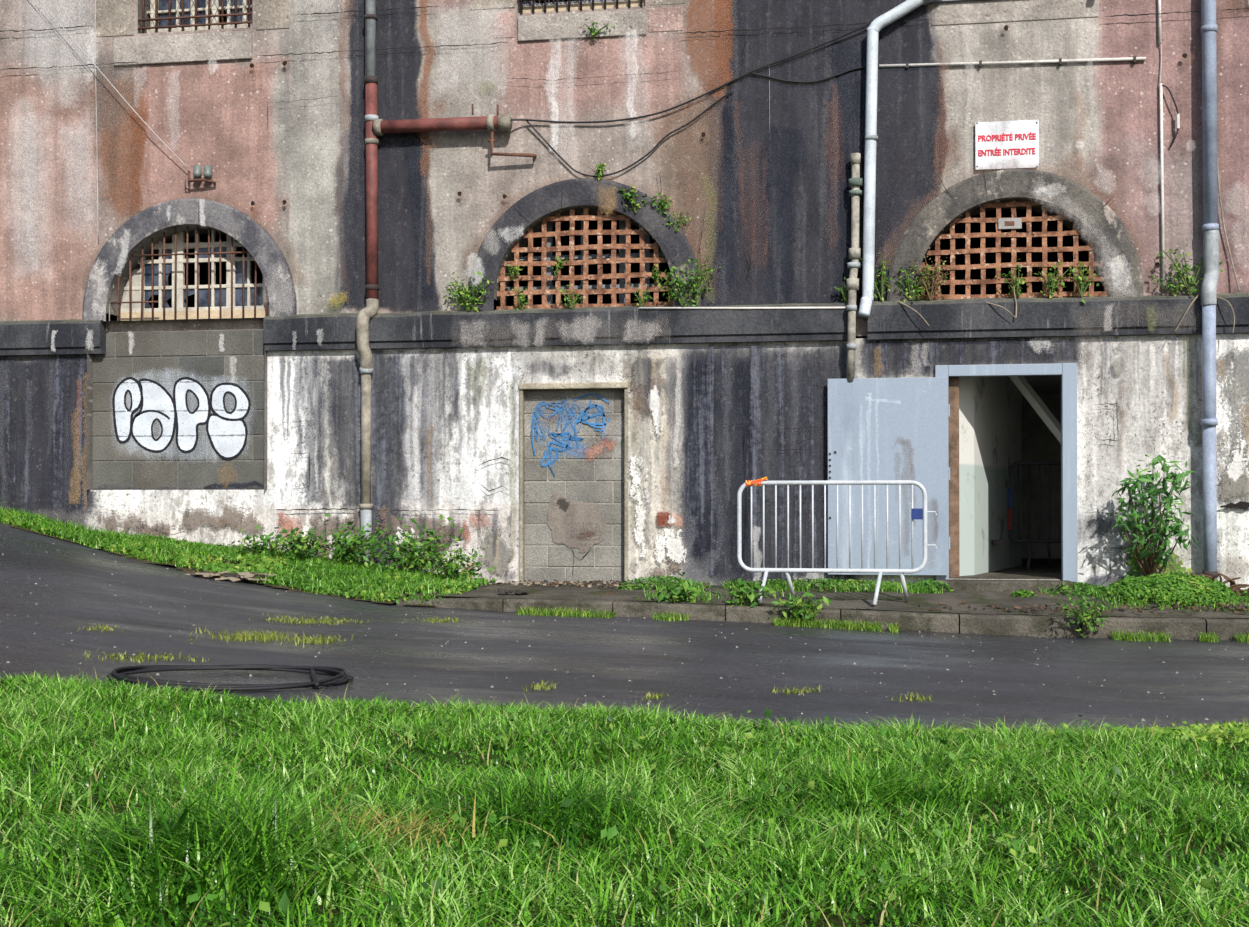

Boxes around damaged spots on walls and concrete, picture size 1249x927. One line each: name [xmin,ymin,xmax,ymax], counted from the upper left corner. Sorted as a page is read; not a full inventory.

rust [687,0,732,97]
damp [701,0,949,308]
damp [862,337,1081,378]
spalling [547,493,606,553]
peeling [629,456,687,585]
damp [675,340,857,586]
peeling [1216,345,1249,503]